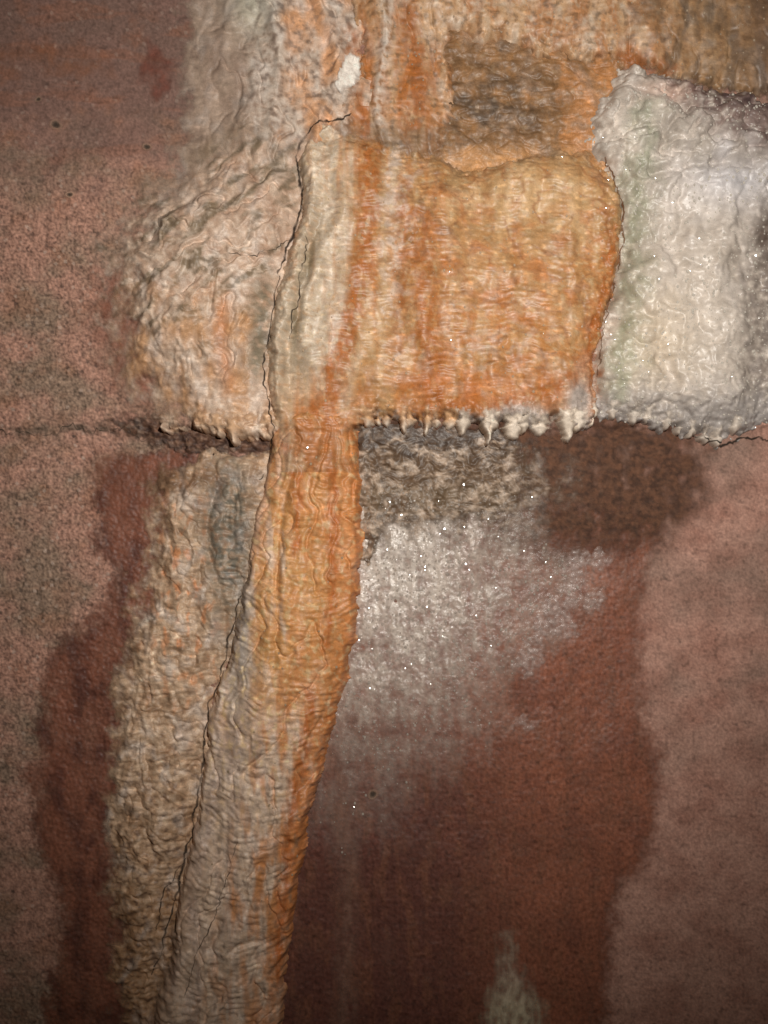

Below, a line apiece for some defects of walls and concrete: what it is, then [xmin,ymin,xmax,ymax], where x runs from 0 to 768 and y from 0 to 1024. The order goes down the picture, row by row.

crack [231,113,351,480]
rust [316,151,375,417]
water stain [26,448,198,1024]
crack [151,595,242,975]
water stain [282,416,705,1024]